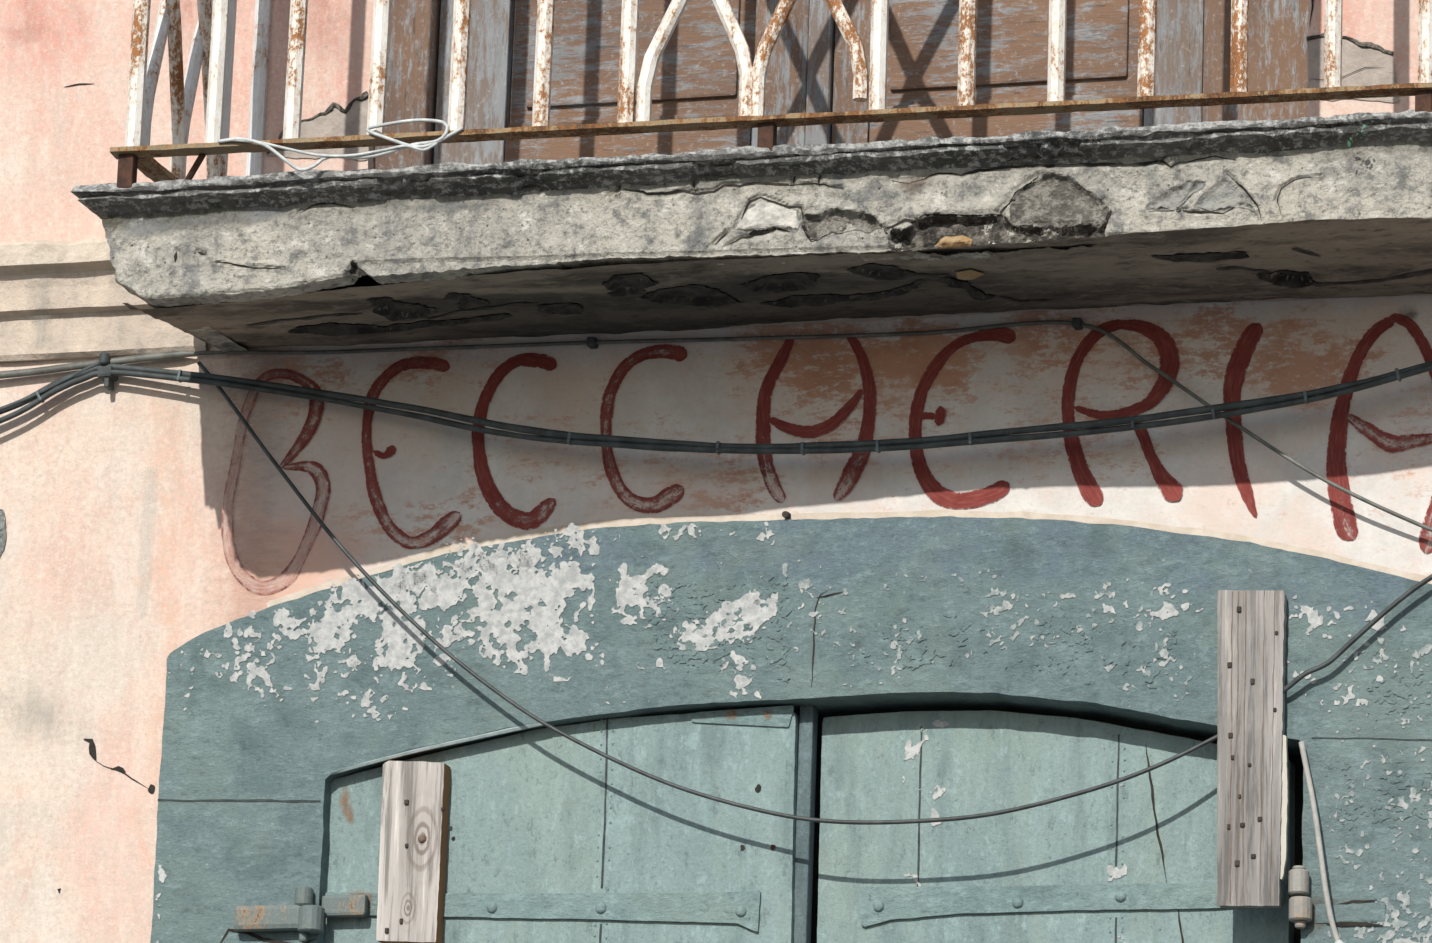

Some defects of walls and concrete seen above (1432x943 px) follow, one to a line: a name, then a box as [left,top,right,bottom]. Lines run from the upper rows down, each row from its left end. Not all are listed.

spalling [1306,33,1399,103]
spalling [266,91,369,161]
spalling [601,172,1110,308]
spalling [1151,251,1249,263]
spalling [1146,176,1259,215]
peeling [169,522,922,721]
crack [811,590,842,687]
peeling [952,569,1204,701]
crack [84,738,147,788]
peeling [1285,594,1432,943]